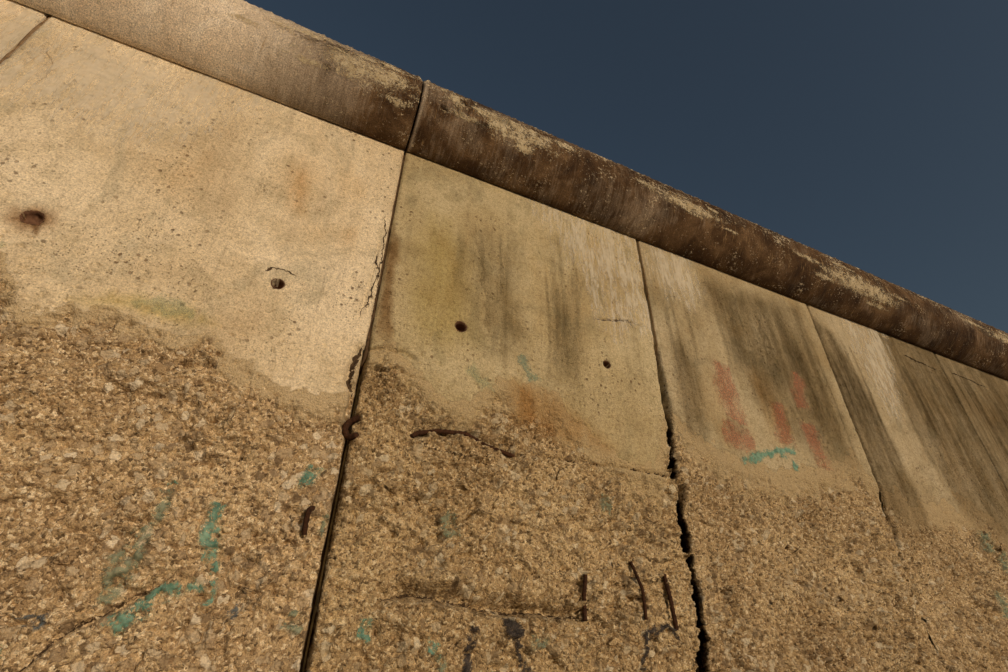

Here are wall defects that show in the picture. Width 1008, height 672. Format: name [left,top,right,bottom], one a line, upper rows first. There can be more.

peeling [639,180,738,235]
crack [346,217,387,397]
leakage [846,323,897,414]
spalling [0,251,1008,672]